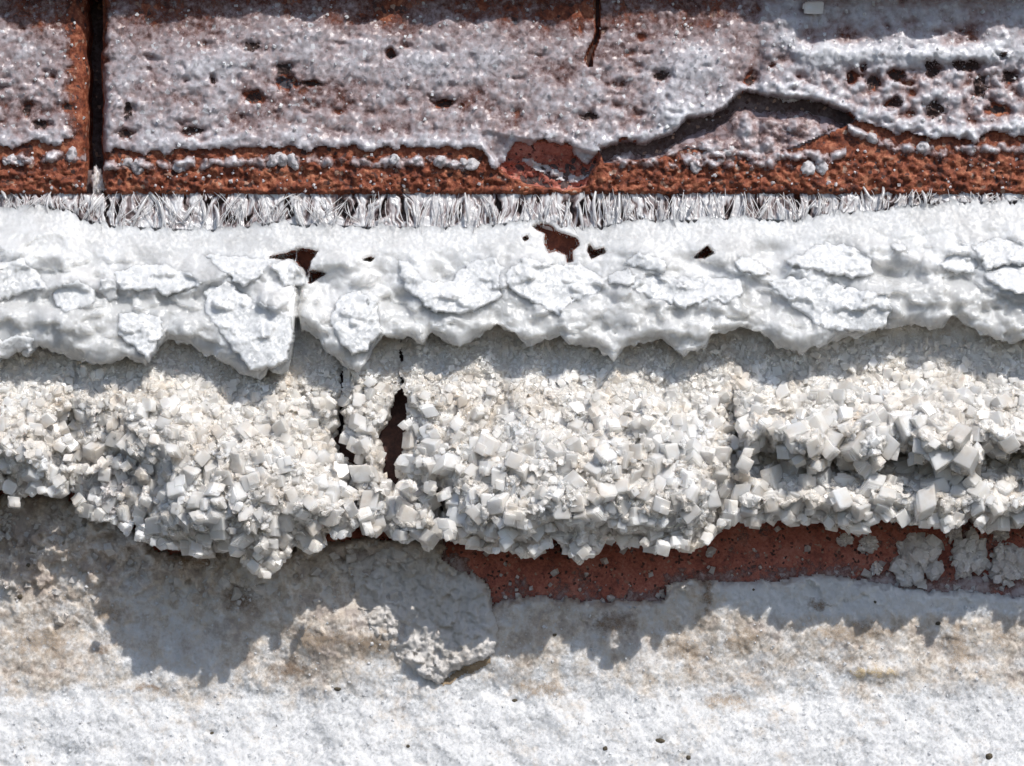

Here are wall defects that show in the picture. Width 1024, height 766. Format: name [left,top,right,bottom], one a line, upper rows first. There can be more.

crack [586,0,601,67]
damp [0,0,86,166]
damp [102,0,1024,183]
spalling [679,105,855,154]
spalling [888,96,903,108]
spalling [926,100,944,119]
spalling [925,59,1005,114]
spalling [500,142,616,191]
damp [0,191,1024,766]